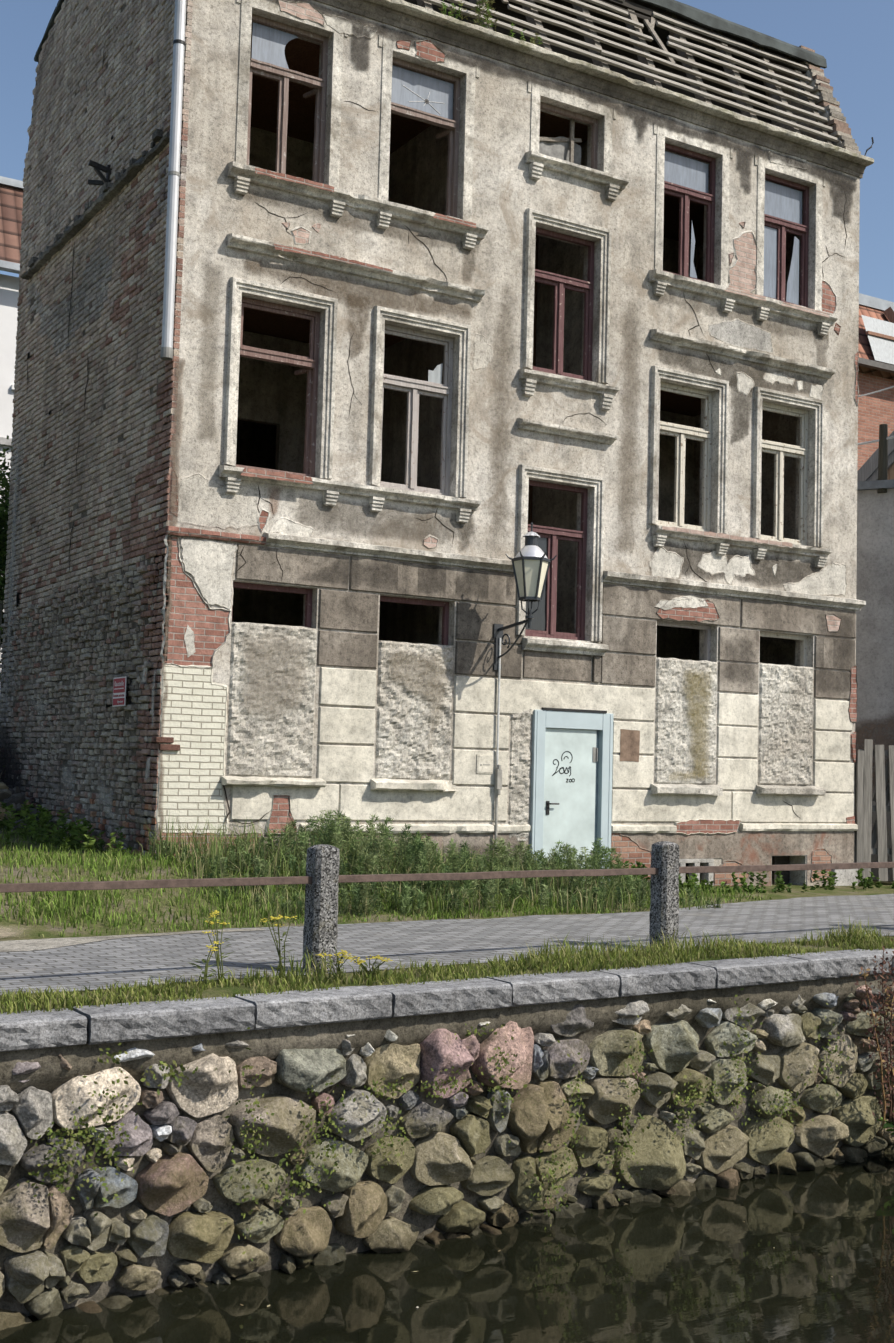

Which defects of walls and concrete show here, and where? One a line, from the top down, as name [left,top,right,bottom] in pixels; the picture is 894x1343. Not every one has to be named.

spalling [278,0,377,40]
spalling [396,39,446,65]
crack [404,225,447,280]
peeling [725,222,841,335]
peeling [648,526,793,585]
peeling [772,562,848,597]
spalling [655,595,720,622]
spalling [825,614,842,632]
flaking render [155,467,315,859]